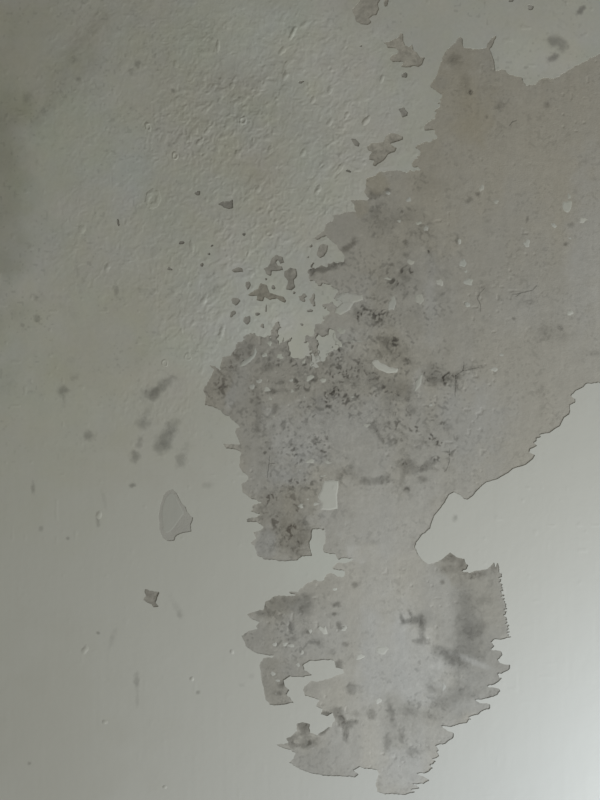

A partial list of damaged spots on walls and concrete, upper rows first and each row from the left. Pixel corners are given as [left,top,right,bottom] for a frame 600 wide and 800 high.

peeling [352,0,388,25]
peeling [203,33,600,795]
peeling [158,489,193,541]
peeling [143,589,159,607]